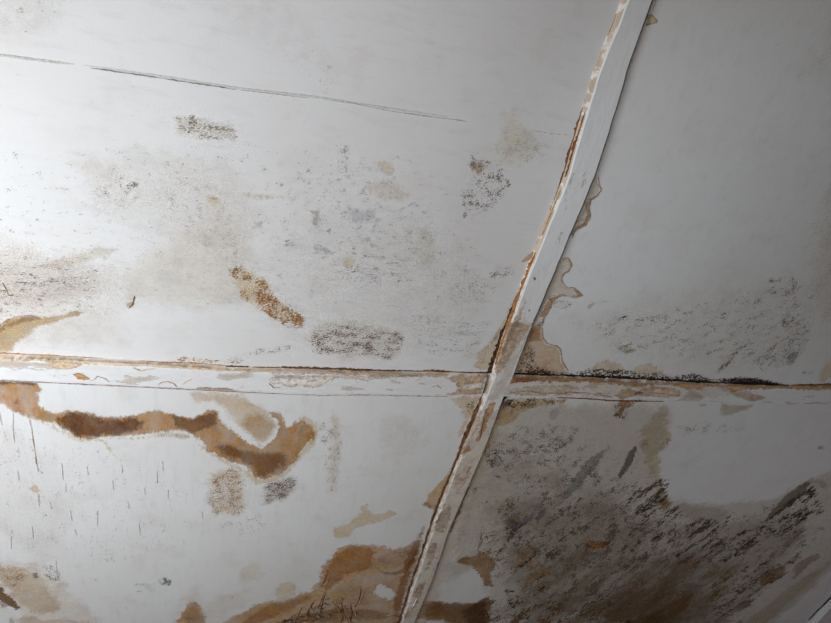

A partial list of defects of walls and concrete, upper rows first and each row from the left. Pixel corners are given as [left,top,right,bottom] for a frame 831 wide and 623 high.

leakage [177,115,237,146]
leakage [0,249,95,324]
leakage [514,258,831,386]
leakage [309,324,405,359]
peeling [0,358,247,387]
peeling [264,370,485,396]
peeling [508,376,831,403]
peeling [470,403,495,441]
peeling [567,452,603,495]
peeling [618,446,636,478]